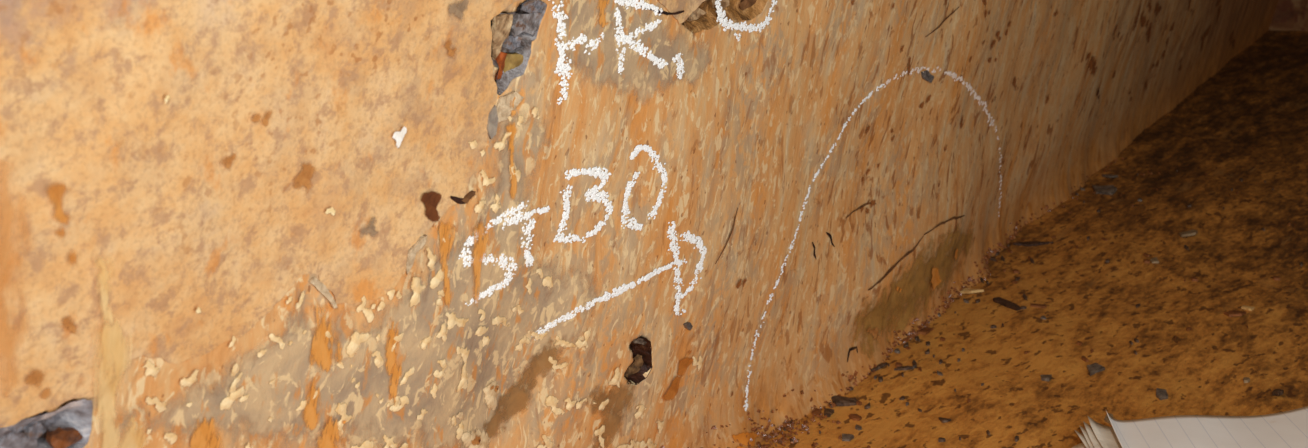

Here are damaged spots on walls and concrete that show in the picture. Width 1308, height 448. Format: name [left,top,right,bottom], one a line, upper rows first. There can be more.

rust [597,0,609,28]
rust [657,0,705,24]
peeling [491,0,768,102]
rust [0,0,524,448]
peeling [114,107,596,448]
rust [514,330,576,352]
spalling [0,399,93,448]
rust [545,367,664,448]
rust [663,351,702,401]
rust [812,408,862,441]
rust [1087,363,1105,376]
rust [1156,388,1168,400]